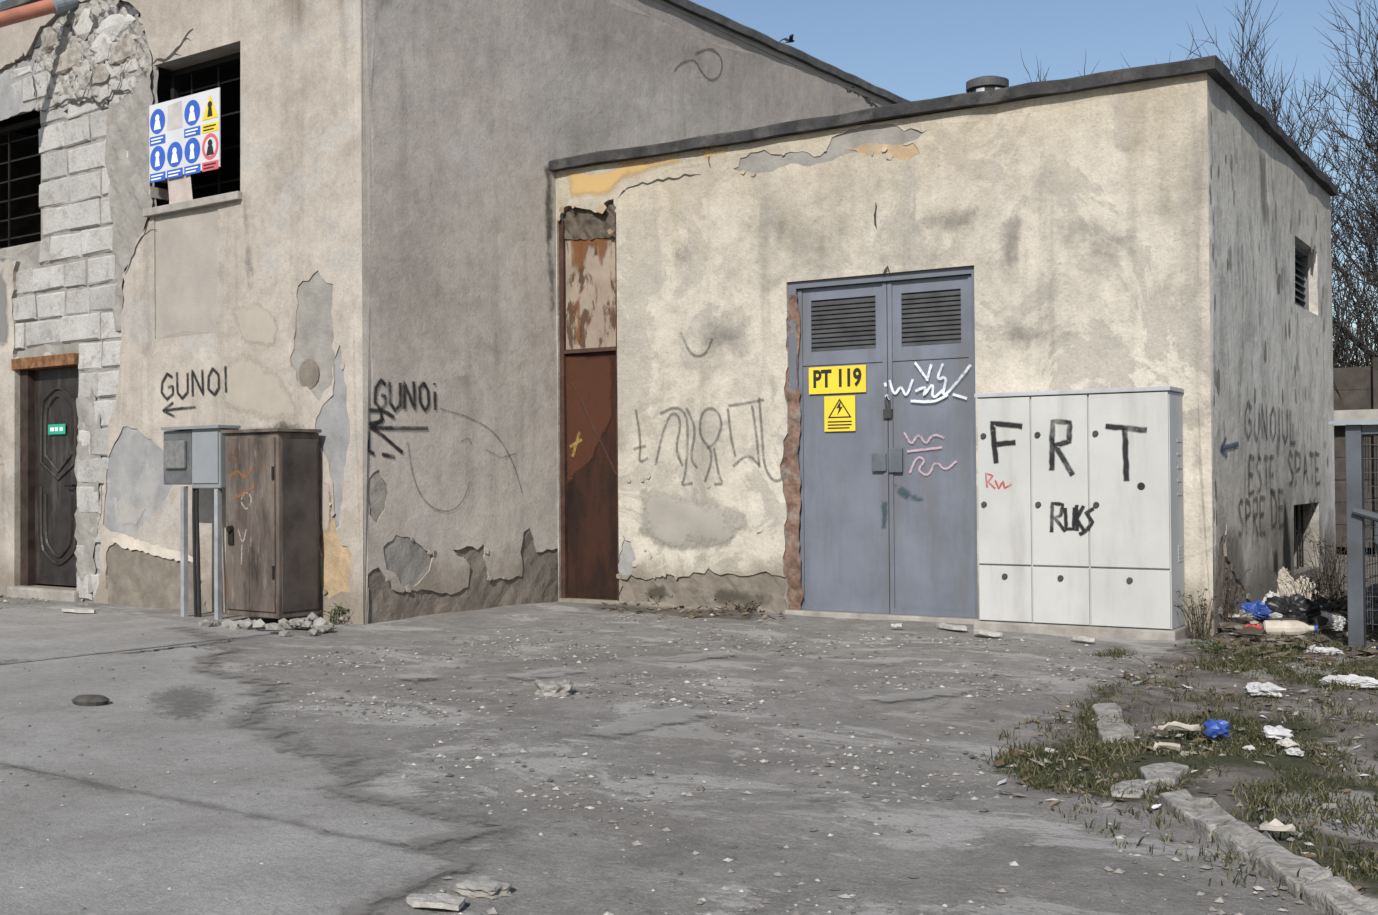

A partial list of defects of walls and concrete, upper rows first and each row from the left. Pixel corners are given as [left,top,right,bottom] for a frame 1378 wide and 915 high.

peeling [734,124,923,176]
rust [571,234,607,269]
spalling [0,0,207,611]
peeling [291,271,352,598]
rust [566,301,612,483]
peeling [367,470,387,524]
peeling [368,529,558,624]